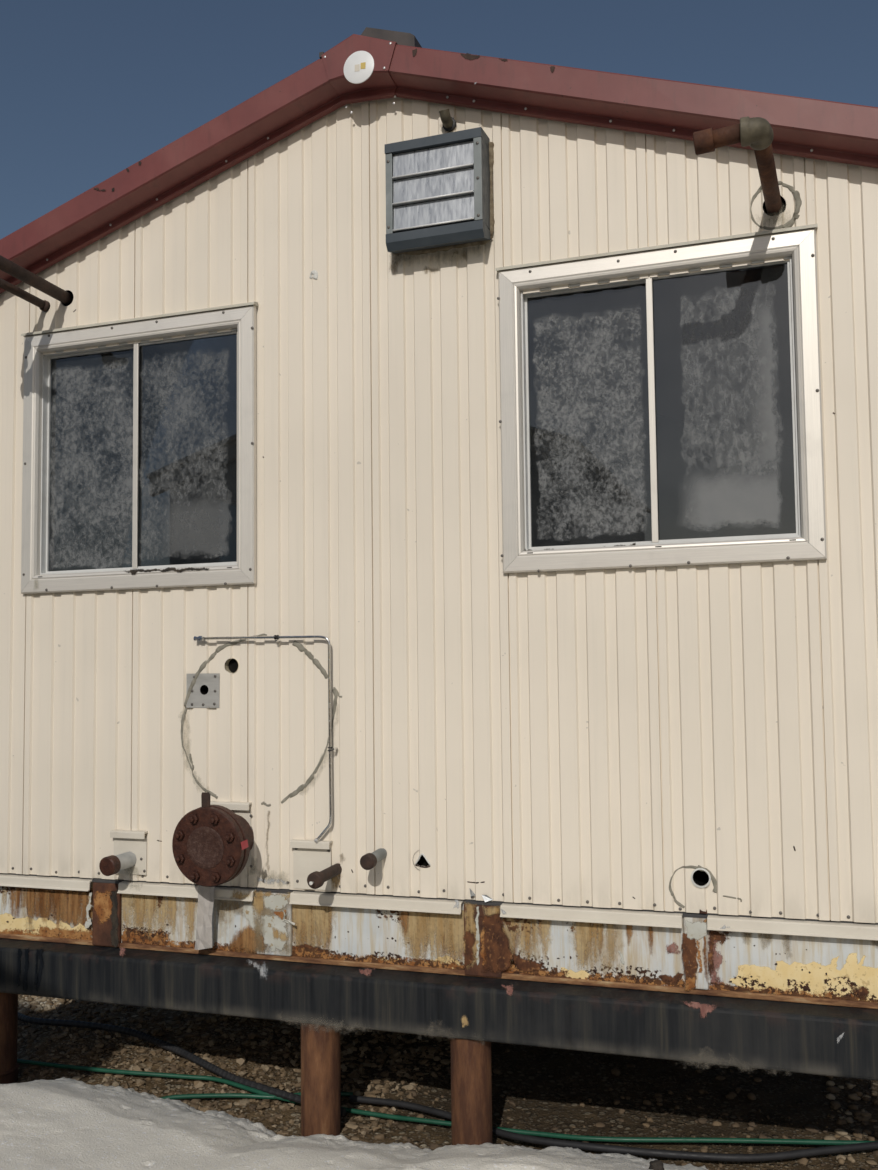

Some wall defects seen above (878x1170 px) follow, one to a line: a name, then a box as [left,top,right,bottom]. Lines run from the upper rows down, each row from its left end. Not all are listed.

peeling [0,892,92,935]
peeling [242,894,295,952]
corrosion [0,886,878,1003]
peeling [729,953,878,1002]